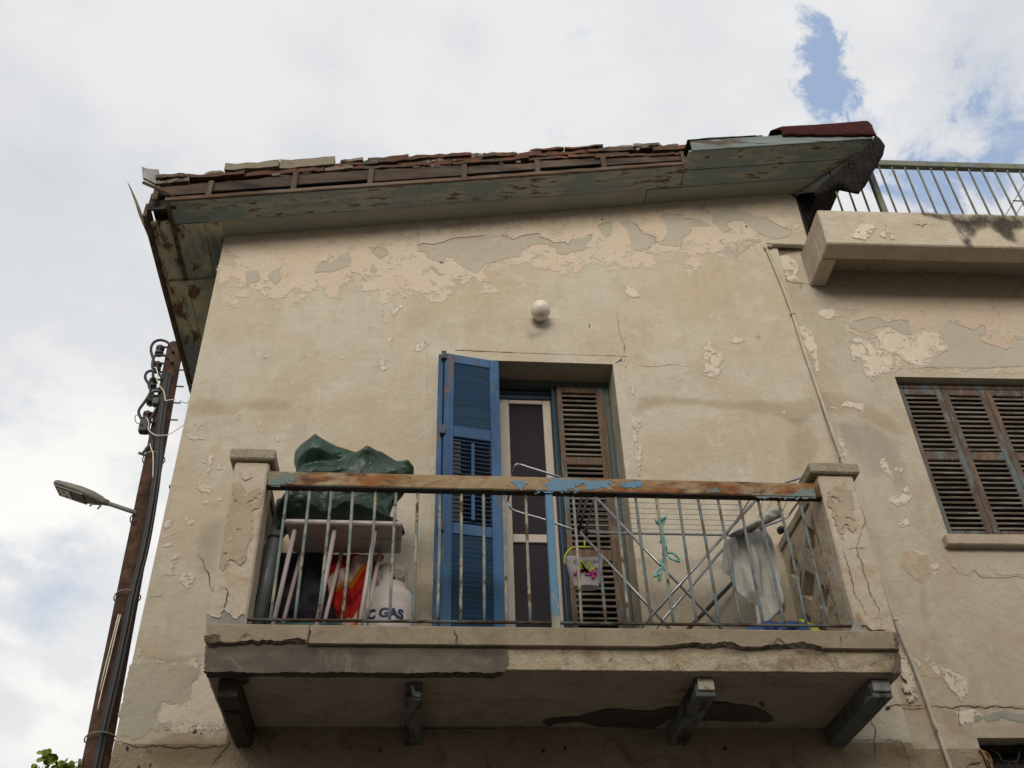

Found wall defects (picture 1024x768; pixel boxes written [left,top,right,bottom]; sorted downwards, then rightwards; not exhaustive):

peeling [216,198,803,319]
water stain [923,212,1023,246]
peeling [701,339,725,379]
peeling [799,325,822,376]
peeling [816,272,1024,382]
spalling [196,455,264,570]
peeling [892,633,1024,726]